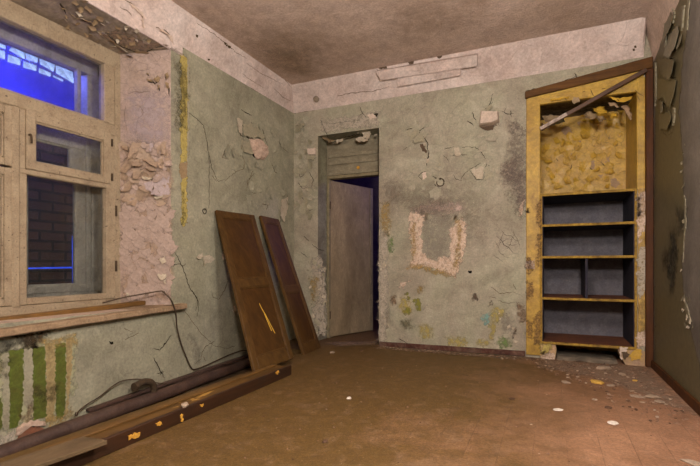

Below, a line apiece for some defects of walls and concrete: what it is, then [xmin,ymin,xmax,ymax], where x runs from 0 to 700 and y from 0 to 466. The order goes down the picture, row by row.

peeling [59,0,174,57]
crack [197,23,383,142]
peeling [118,48,190,301]
crack [142,245,234,363]
crack [189,109,291,210]
peeling [303,236,327,337]
peeling [407,202,468,280]
peeling [448,200,555,359]
peeling [654,0,700,402]
peeling [0,333,78,445]